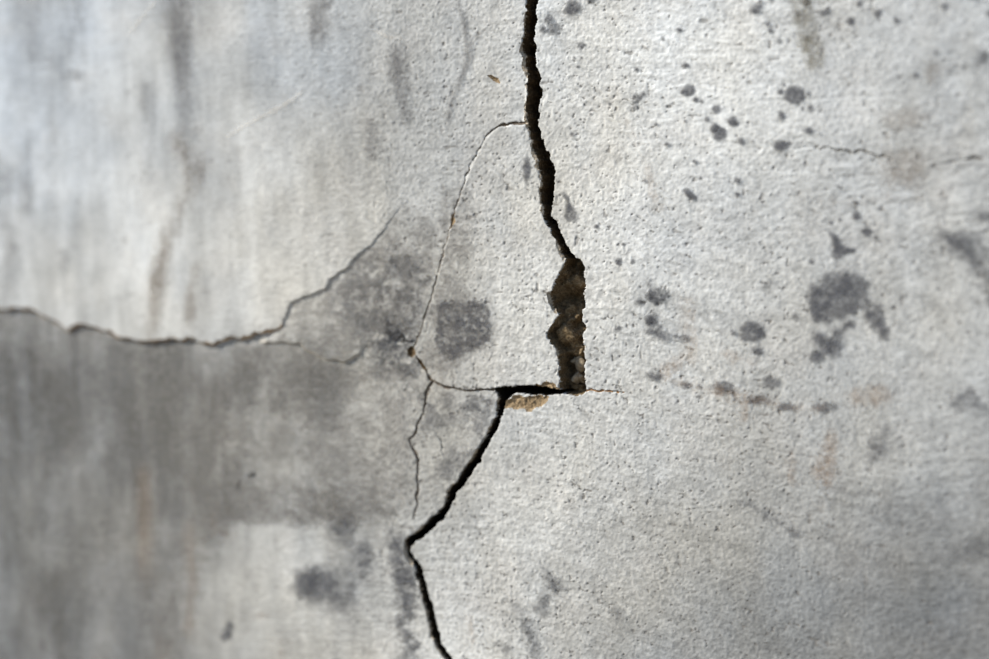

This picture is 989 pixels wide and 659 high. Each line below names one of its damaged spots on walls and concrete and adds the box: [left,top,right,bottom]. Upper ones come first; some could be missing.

leakage [681,85,702,102]
leakage [778,84,812,109]
leakage [705,106,737,140]
leakage [829,219,855,259]
leakage [945,236,975,260]
leakage [434,300,489,360]
crack [403,0,624,659]
leakage [809,273,887,362]
leakage [110,338,190,524]
leakage [296,568,339,600]
leakage [391,540,414,638]